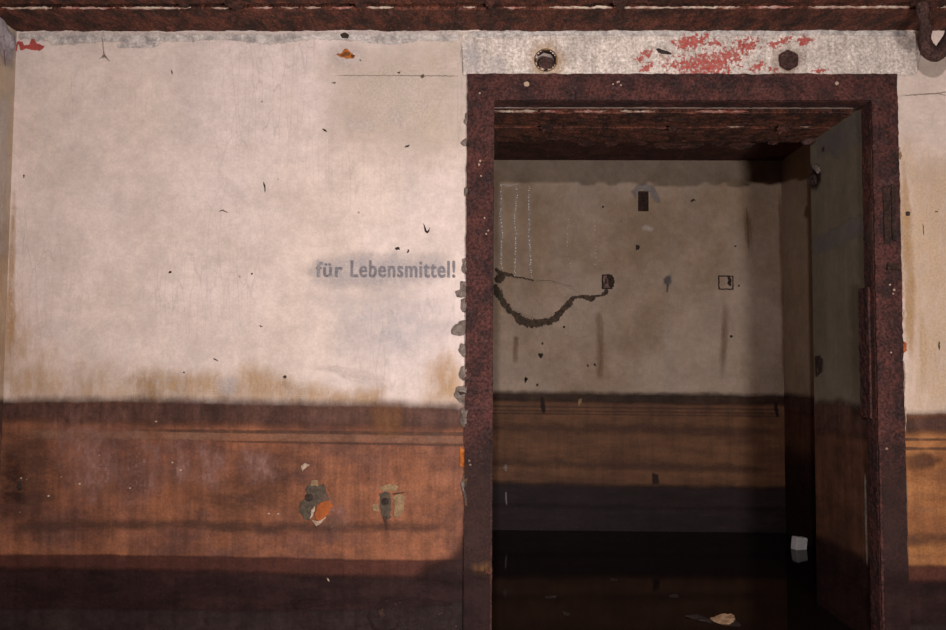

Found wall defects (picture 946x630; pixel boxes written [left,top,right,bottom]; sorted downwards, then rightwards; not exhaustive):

peeling [0,18,920,76]
spalling [451,258,468,428]
damp [0,400,465,630]
spalling [299,480,334,526]
spalling [372,484,405,530]
damp [905,414,946,630]